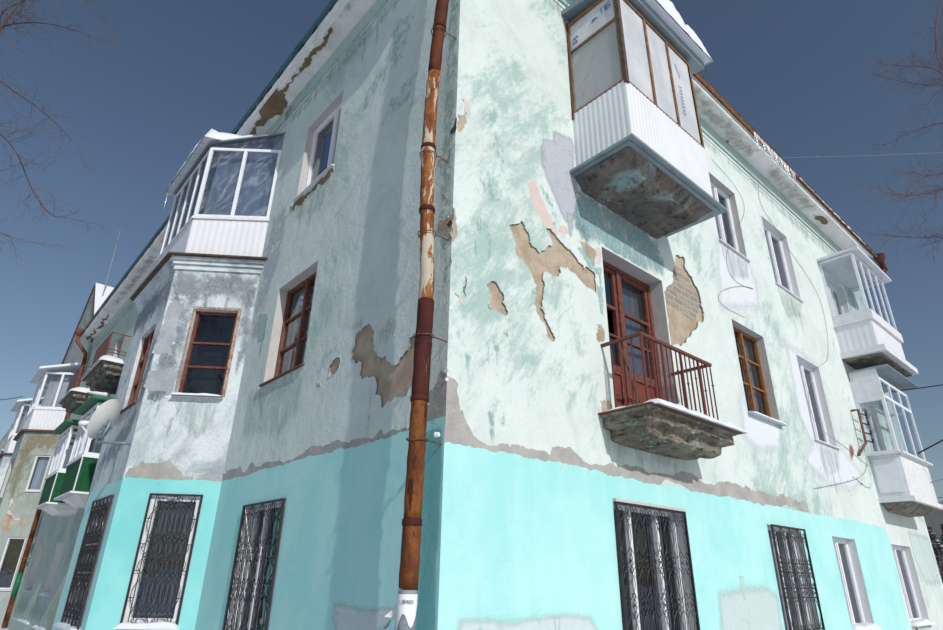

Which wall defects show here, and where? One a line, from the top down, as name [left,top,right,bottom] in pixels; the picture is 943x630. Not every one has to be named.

peeling [249,28,333,135]
spalling [290,167,334,212]
spalling [437,208,458,244]
peeling [508,131,605,343]
peeling [486,280,509,338]
spalling [664,254,705,347]
peeling [316,323,415,409]
peeling [124,423,410,485]
peeling [427,369,810,513]